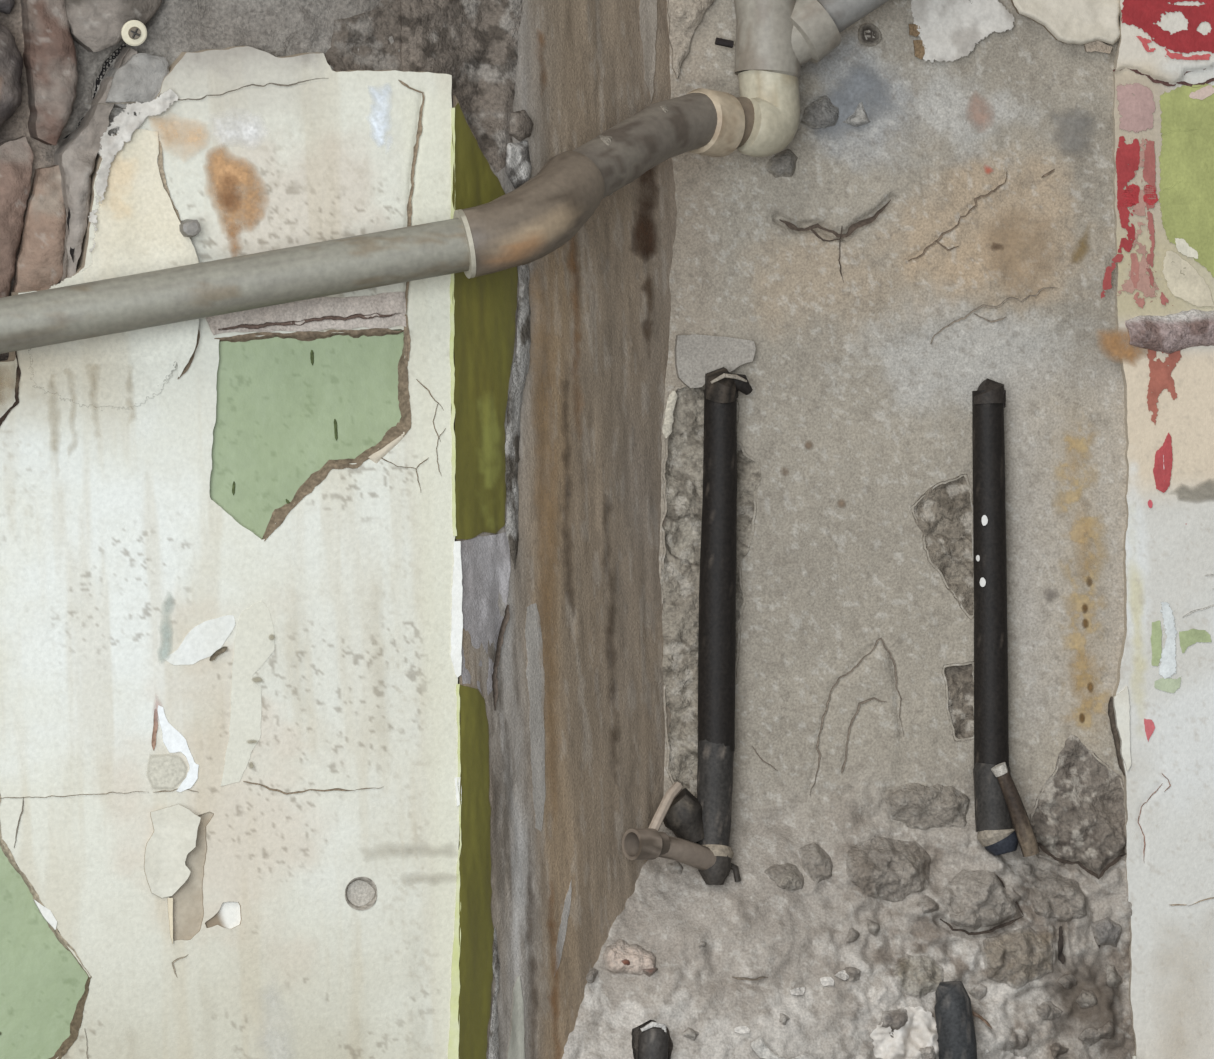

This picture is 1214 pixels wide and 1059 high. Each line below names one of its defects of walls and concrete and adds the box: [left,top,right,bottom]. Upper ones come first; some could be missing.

peeling [1011,0,1214,60]
rust [208,149,262,252]
crack [779,200,891,283]
crack [0,351,21,426]
peeling [28,292,411,541]
crack [0,788,197,847]
crack [243,781,382,794]
peeling [448,264,531,1059]
flaking render [660,384,705,798]
crack [810,638,904,793]
rust [1060,429,1105,727]
peeling [0,824,92,1059]